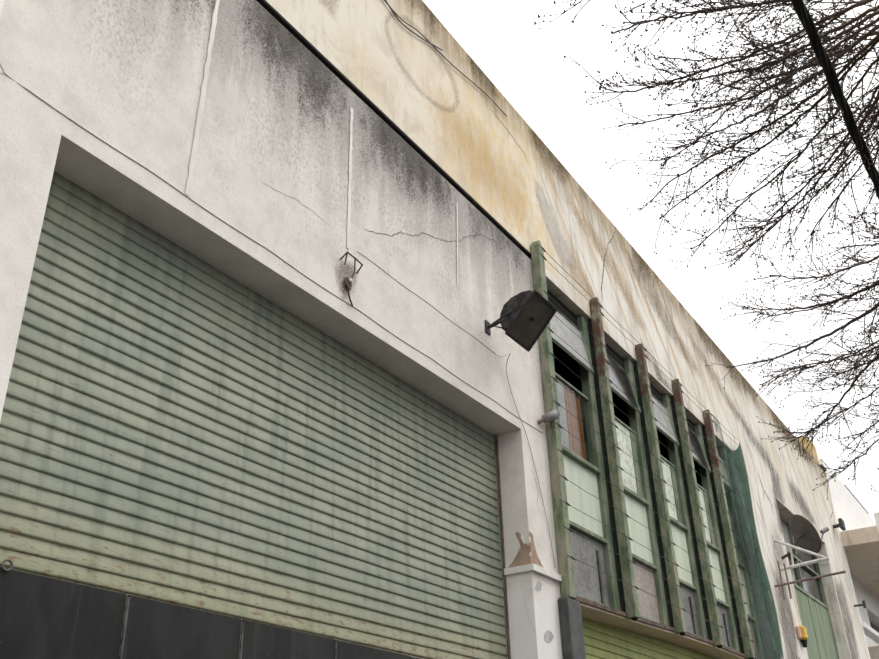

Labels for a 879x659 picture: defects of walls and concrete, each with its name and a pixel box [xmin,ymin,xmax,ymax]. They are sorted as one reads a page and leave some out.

leakage [243,0,346,125]
leakage [470,59,494,93]
leakage [357,102,453,214]
crack [367,227,501,250]